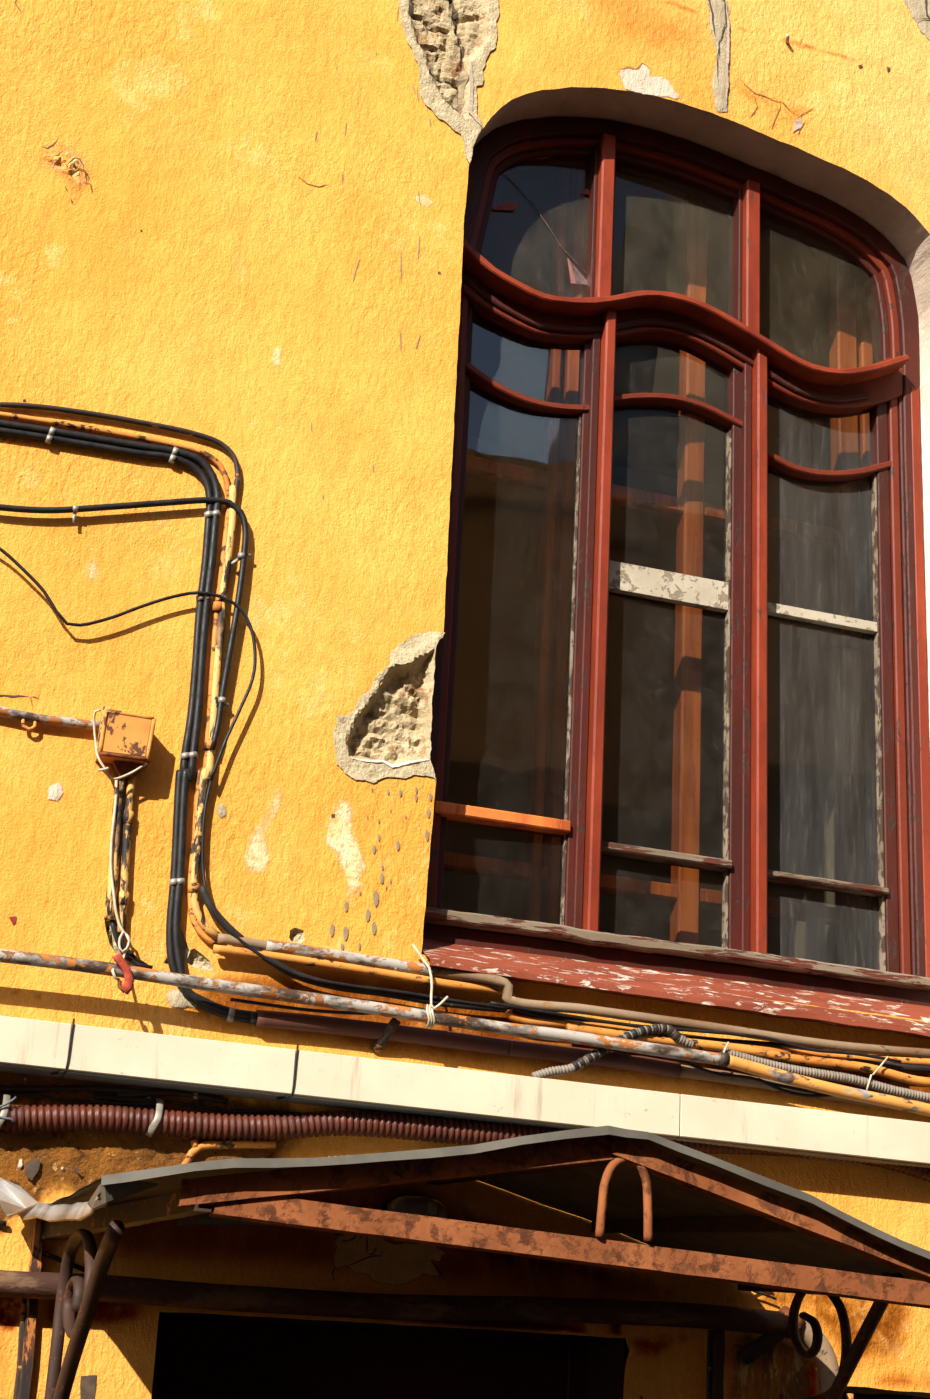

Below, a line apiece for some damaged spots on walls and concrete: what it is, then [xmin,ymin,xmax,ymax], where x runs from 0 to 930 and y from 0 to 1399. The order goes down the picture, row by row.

spalling [398,0,499,163]
peeling [619,63,679,99]
spalling [333,632,445,783]
peeling [245,790,280,873]
peeling [326,801,365,889]
peeling [332,1233,445,1285]
corrosion [0,1297,20,1328]